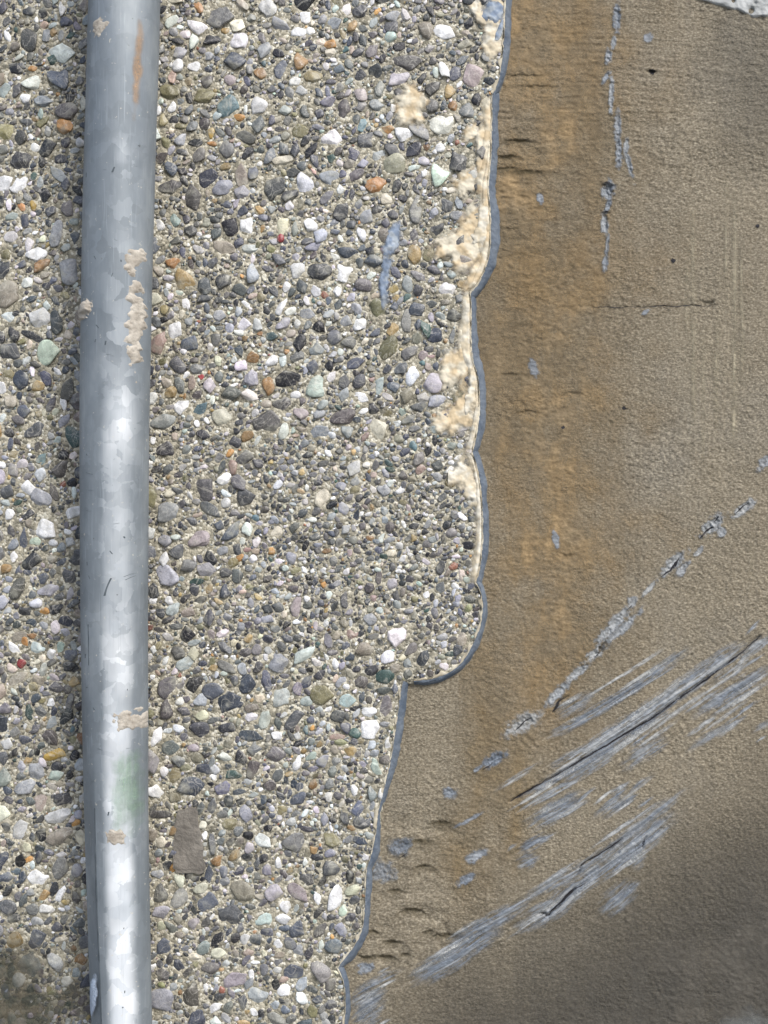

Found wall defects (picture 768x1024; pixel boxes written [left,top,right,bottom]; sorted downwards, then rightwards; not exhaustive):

peeling [602,4,634,177]
peeling [601,179,615,271]
crack [511,638,758,801]
crack [541,837,646,918]